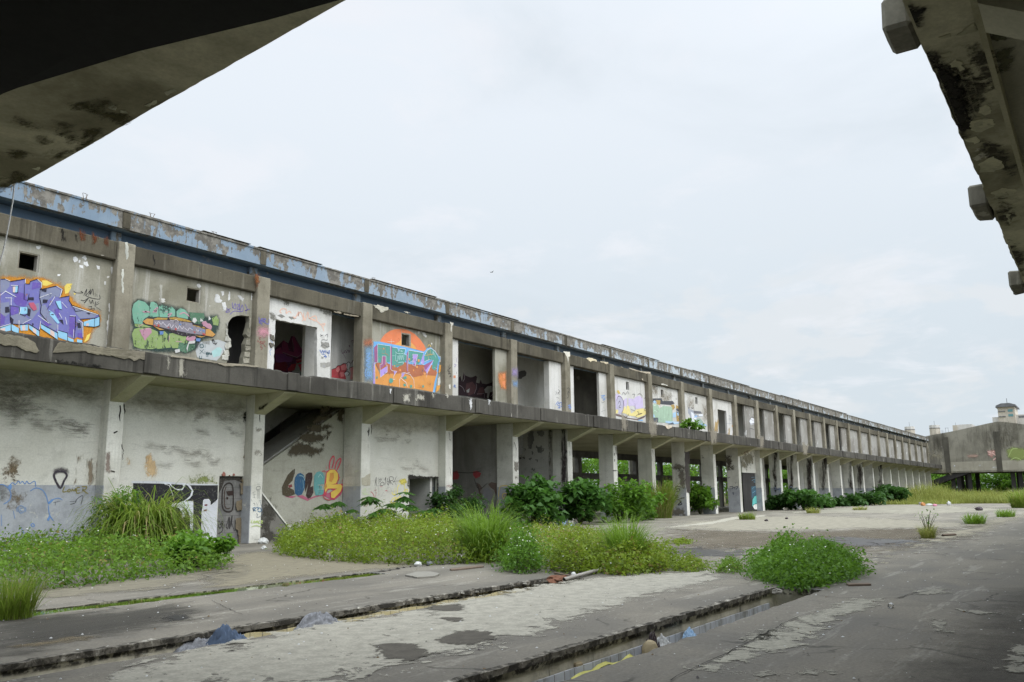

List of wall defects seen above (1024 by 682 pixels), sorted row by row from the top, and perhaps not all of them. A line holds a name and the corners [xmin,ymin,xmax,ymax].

leakage [908,5,927,28]
mould [71,101,130,125]
leakage [927,33,1018,176]
mould [17,119,102,159]
mould [0,172,26,193]
leakage [996,196,1016,226]
peeling [73,242,129,293]
leakage [1010,246,1024,272]
spalling [171,291,259,367]
leakage [288,406,345,458]